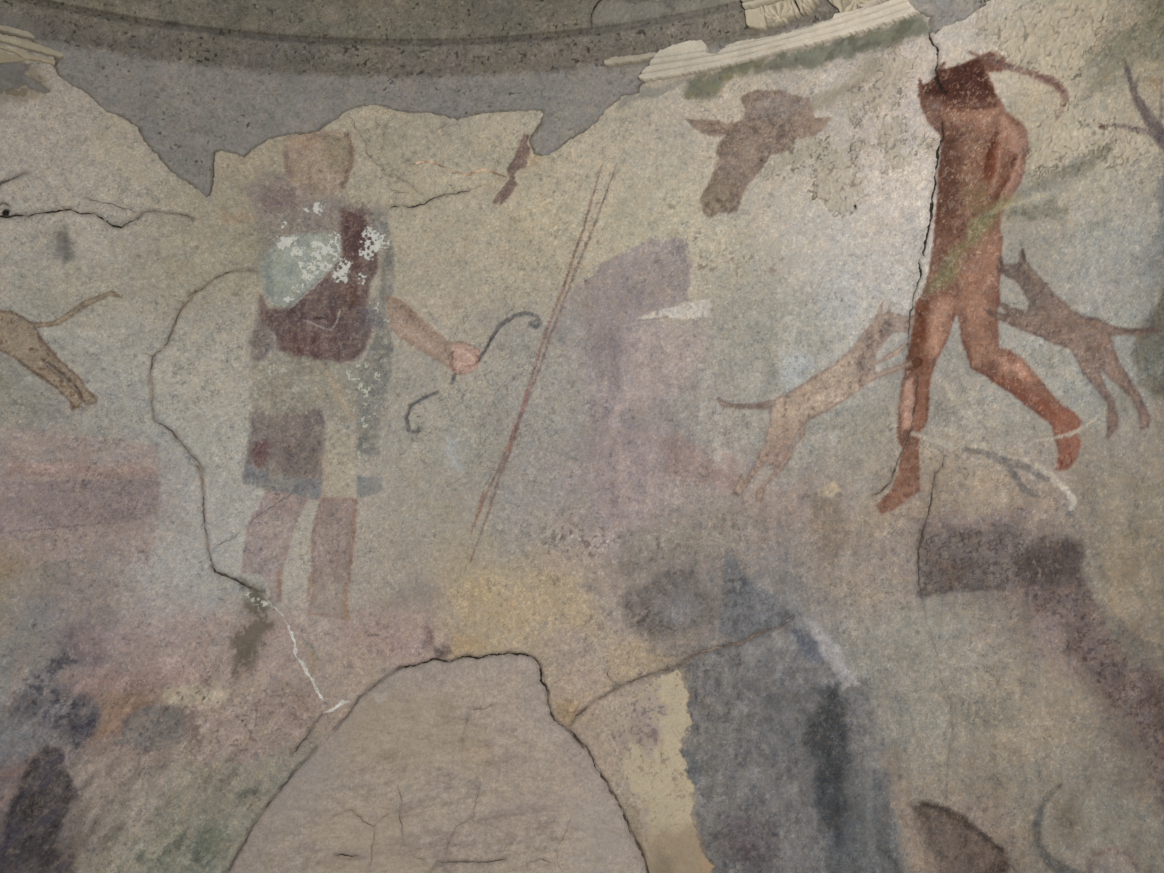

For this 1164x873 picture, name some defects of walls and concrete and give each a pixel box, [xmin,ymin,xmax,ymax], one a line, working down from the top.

crack [928,32,946,94]
crack [0,173,193,228]
peeling [273,219,391,304]
crack [872,122,943,496]
peeling [343,361,381,428]
crack [146,270,791,873]